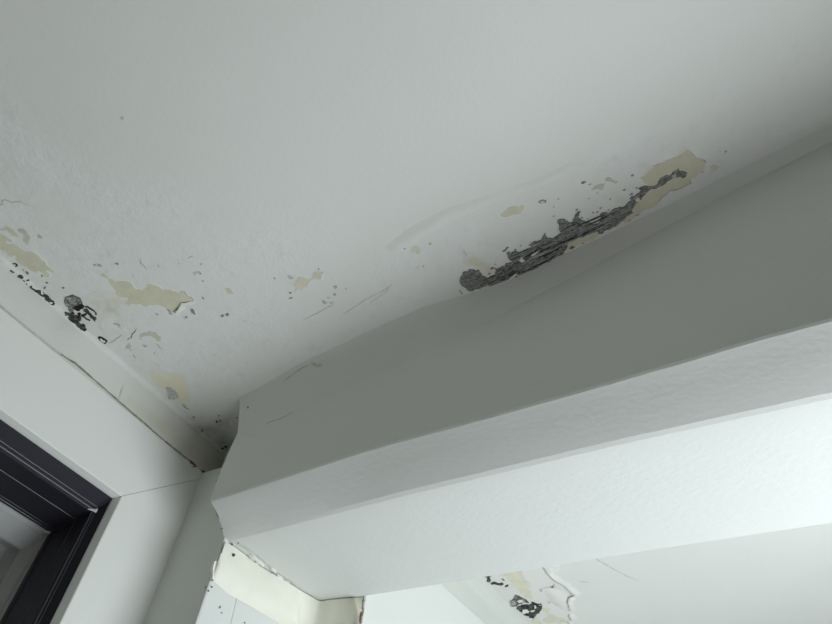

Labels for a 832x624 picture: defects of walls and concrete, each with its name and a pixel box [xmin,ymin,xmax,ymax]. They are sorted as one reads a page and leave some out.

spalling [459,144,719,294]
peeling [0,227,204,357]
peeling [486,565,581,624]